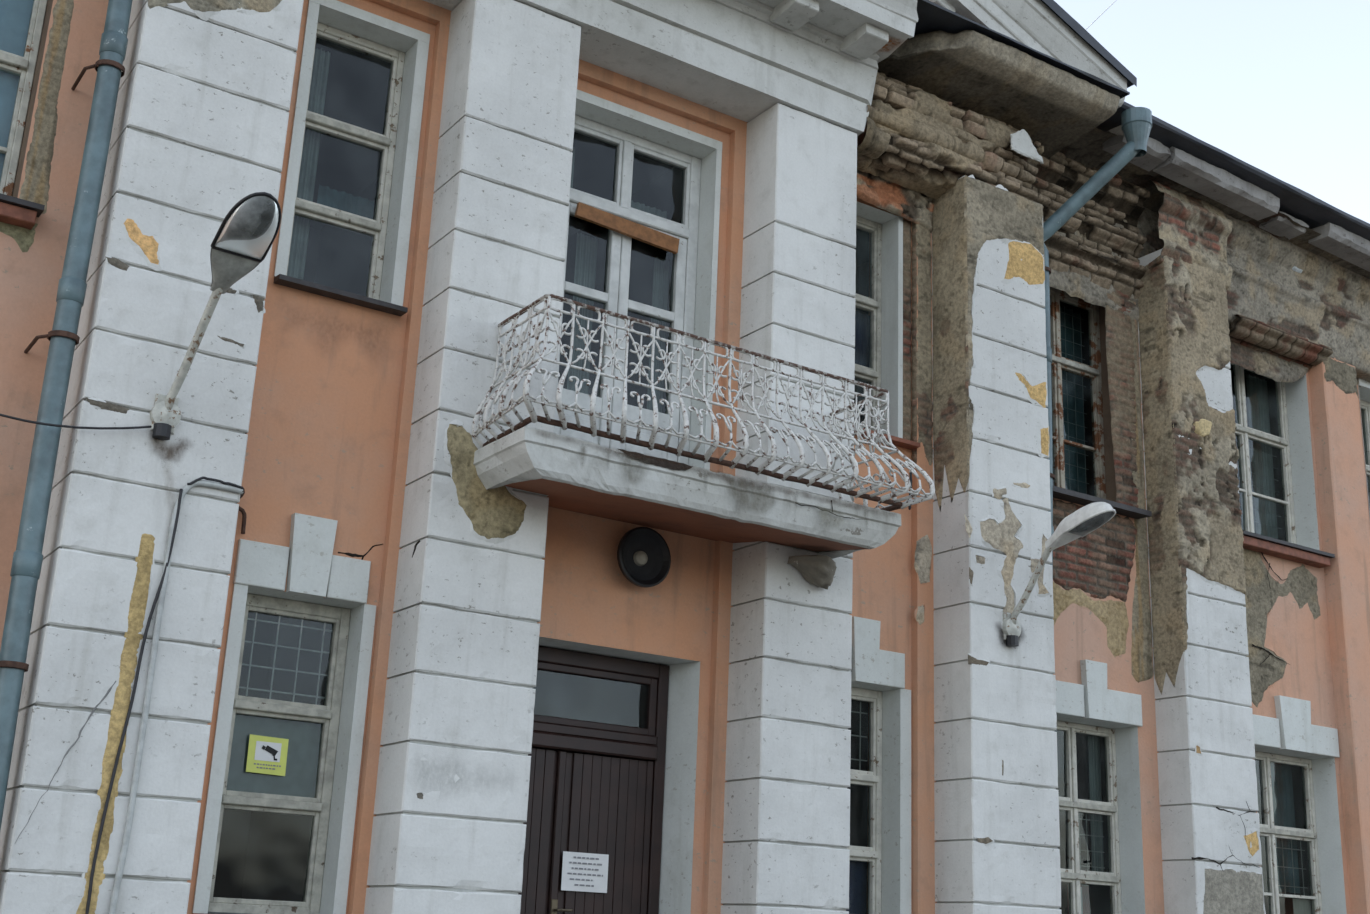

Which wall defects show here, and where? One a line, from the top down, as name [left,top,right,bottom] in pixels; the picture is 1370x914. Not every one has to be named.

flaking render [0,0,74,252]
peeling [124,219,163,271]
flaking render [148,0,284,21]
flaking render [443,419,527,544]
flaking render [857,170,1367,707]
peeling [76,533,155,914]